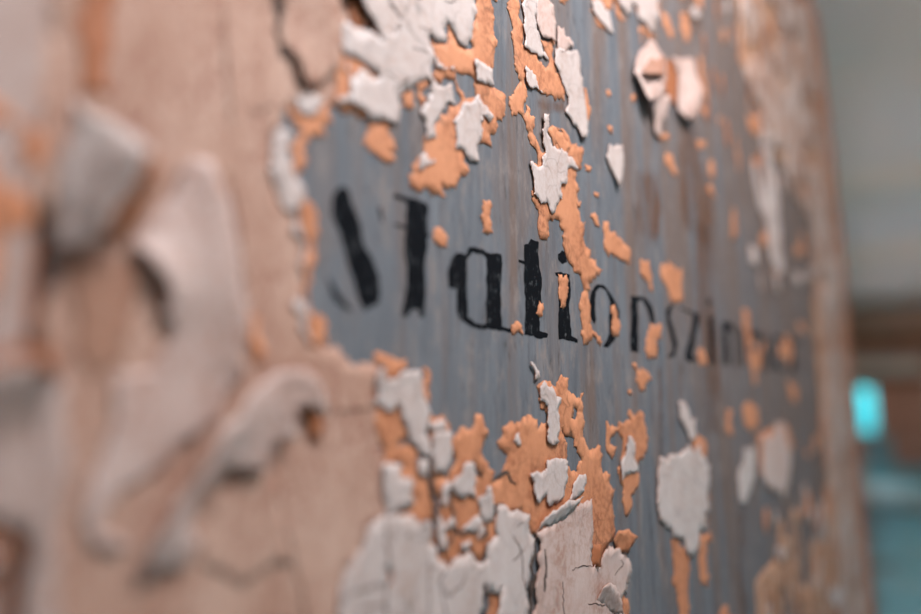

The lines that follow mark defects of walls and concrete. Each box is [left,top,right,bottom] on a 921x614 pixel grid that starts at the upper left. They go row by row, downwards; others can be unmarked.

crack [273,0,286,59]
peeling [590,0,740,174]
peeling [0,0,683,614]
peeling [698,347,707,366]
peeling [715,0,877,614]
crack [337,446,516,614]
crack [513,522,592,614]
peeling [657,401,712,614]